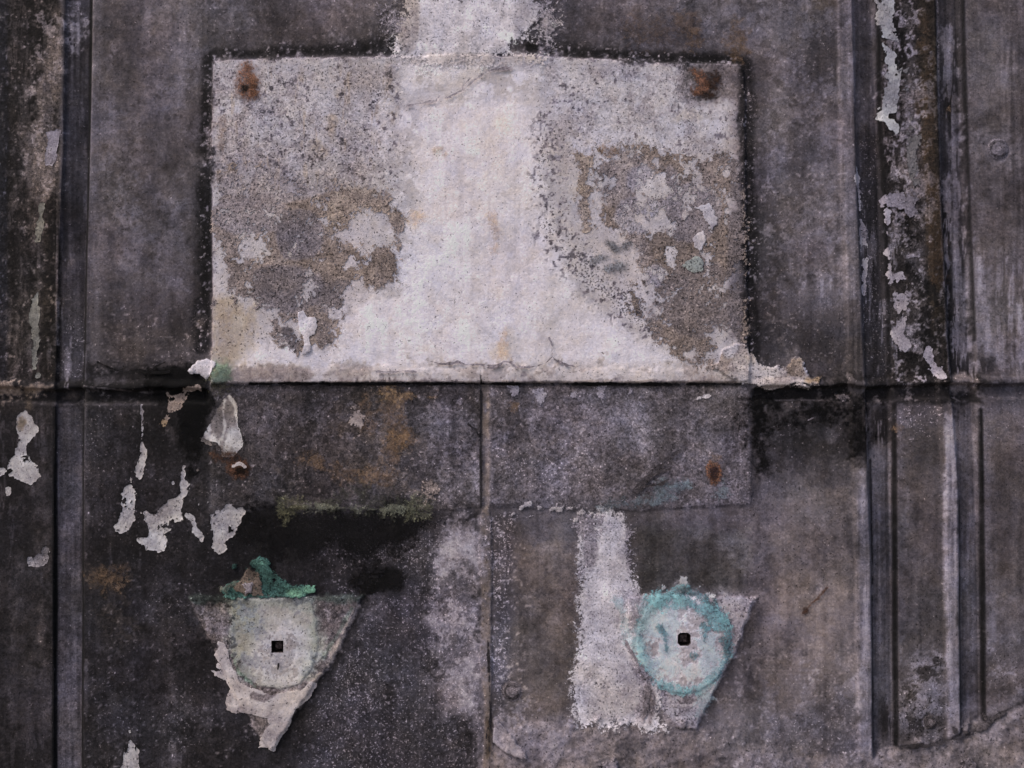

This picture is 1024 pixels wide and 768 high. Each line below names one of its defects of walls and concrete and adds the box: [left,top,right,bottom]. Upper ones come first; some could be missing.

rust [234,61,259,101]
rust [690,68,723,100]
peeling [874,0,925,352]
flaking render [209,159,408,357]
flaking render [572,141,822,390]
peeling [0,410,41,496]
peeling [114,404,246,554]
peeling [161,358,216,427]
peeling [201,394,243,457]
rust [210,451,250,480]
rust [706,460,722,486]
water stain [221,479,446,600]